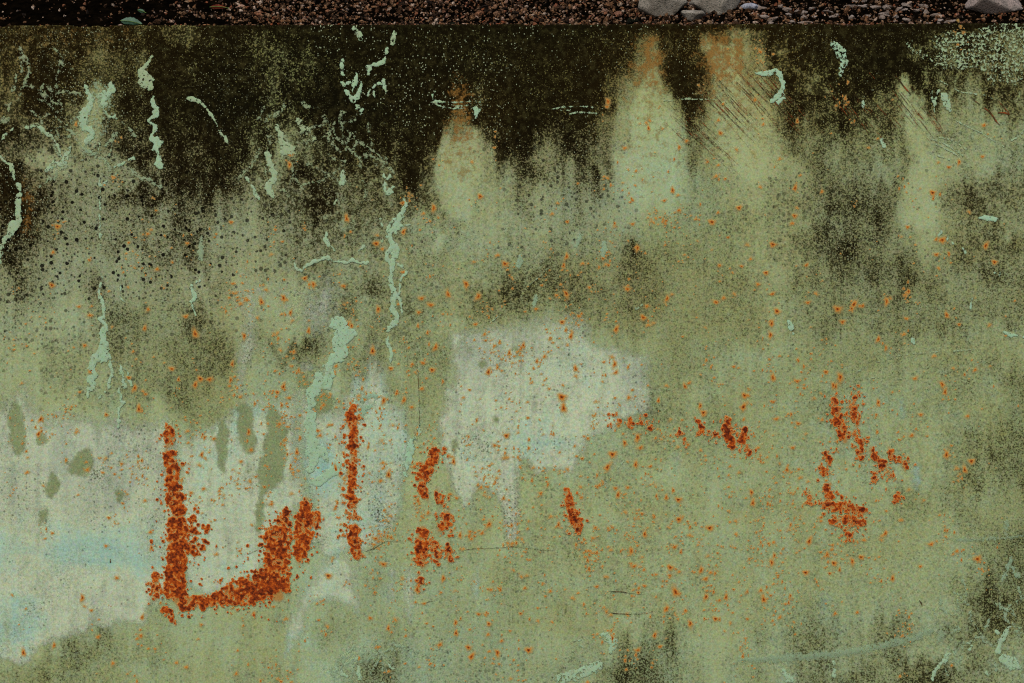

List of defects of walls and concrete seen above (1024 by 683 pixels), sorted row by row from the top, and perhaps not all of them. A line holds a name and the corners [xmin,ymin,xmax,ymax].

peeling [0,155,22,264]
peeling [1,46,165,249]
peeling [186,96,228,144]
peeling [238,102,411,363]
peeling [365,30,397,75]
peeling [86,276,133,428]
peeling [303,316,358,487]
corrosion [81,254,929,683]